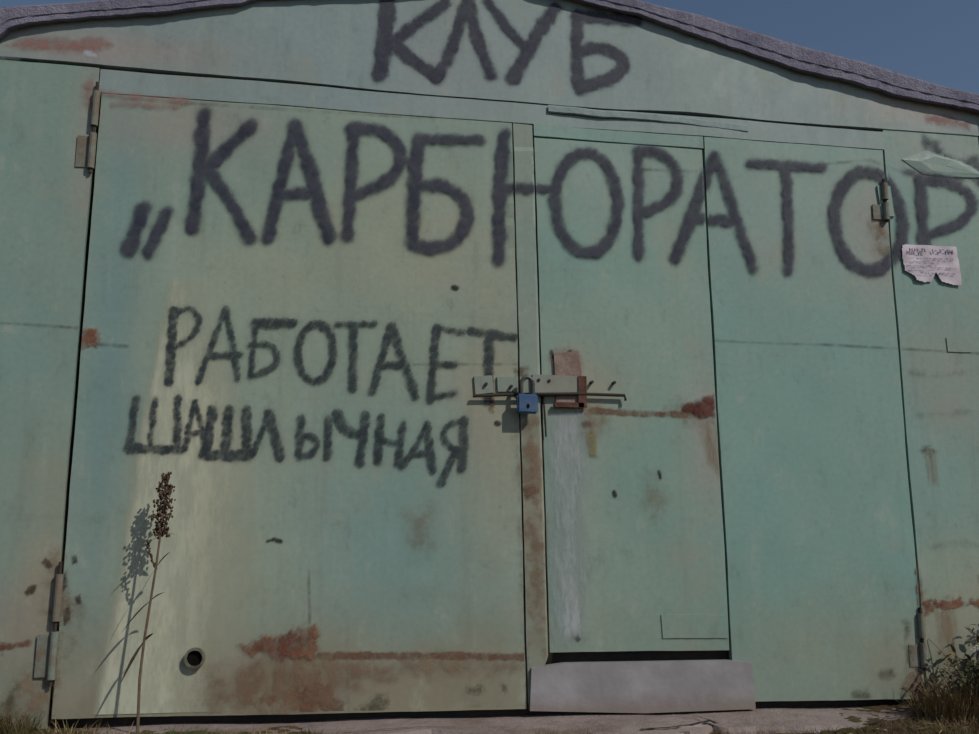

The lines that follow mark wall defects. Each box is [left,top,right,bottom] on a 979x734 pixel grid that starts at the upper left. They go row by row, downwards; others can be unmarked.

rust [81,328,99,347]
rust [582,396,716,455]
rust [916,568,979,616]
rust [240,624,524,661]